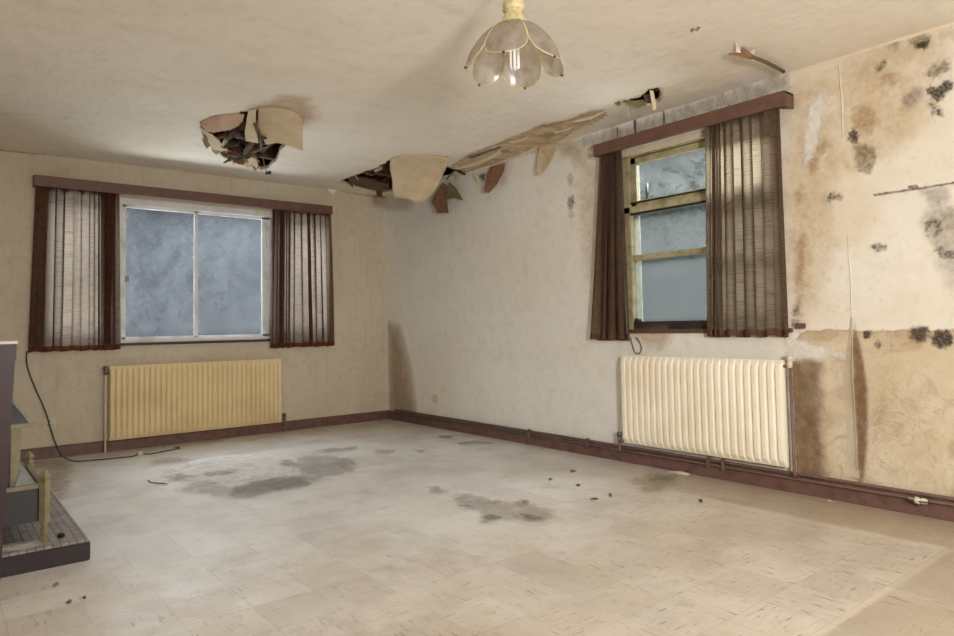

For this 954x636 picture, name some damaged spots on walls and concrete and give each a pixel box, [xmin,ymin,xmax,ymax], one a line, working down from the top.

water stain [927,67,953,116]
peeling [804,93,828,168]
water stain [848,128,874,169]
crack [873,182,954,196]
flaking render [783,338,867,475]
water stain [167,455,296,482]